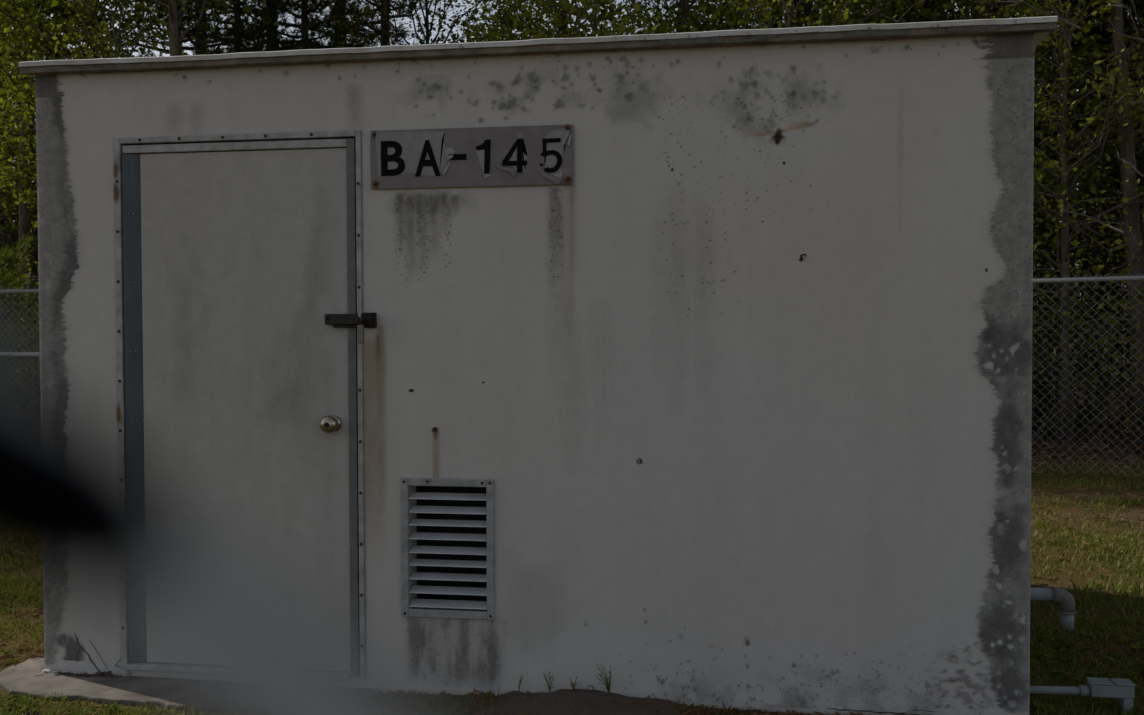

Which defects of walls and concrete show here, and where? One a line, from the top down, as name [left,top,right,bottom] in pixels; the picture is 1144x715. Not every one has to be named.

damp [644,35,725,45]
damp [843,27,909,49]
damp [35,74,79,405]
damp [928,21,1034,711]
damp [43,586,83,664]